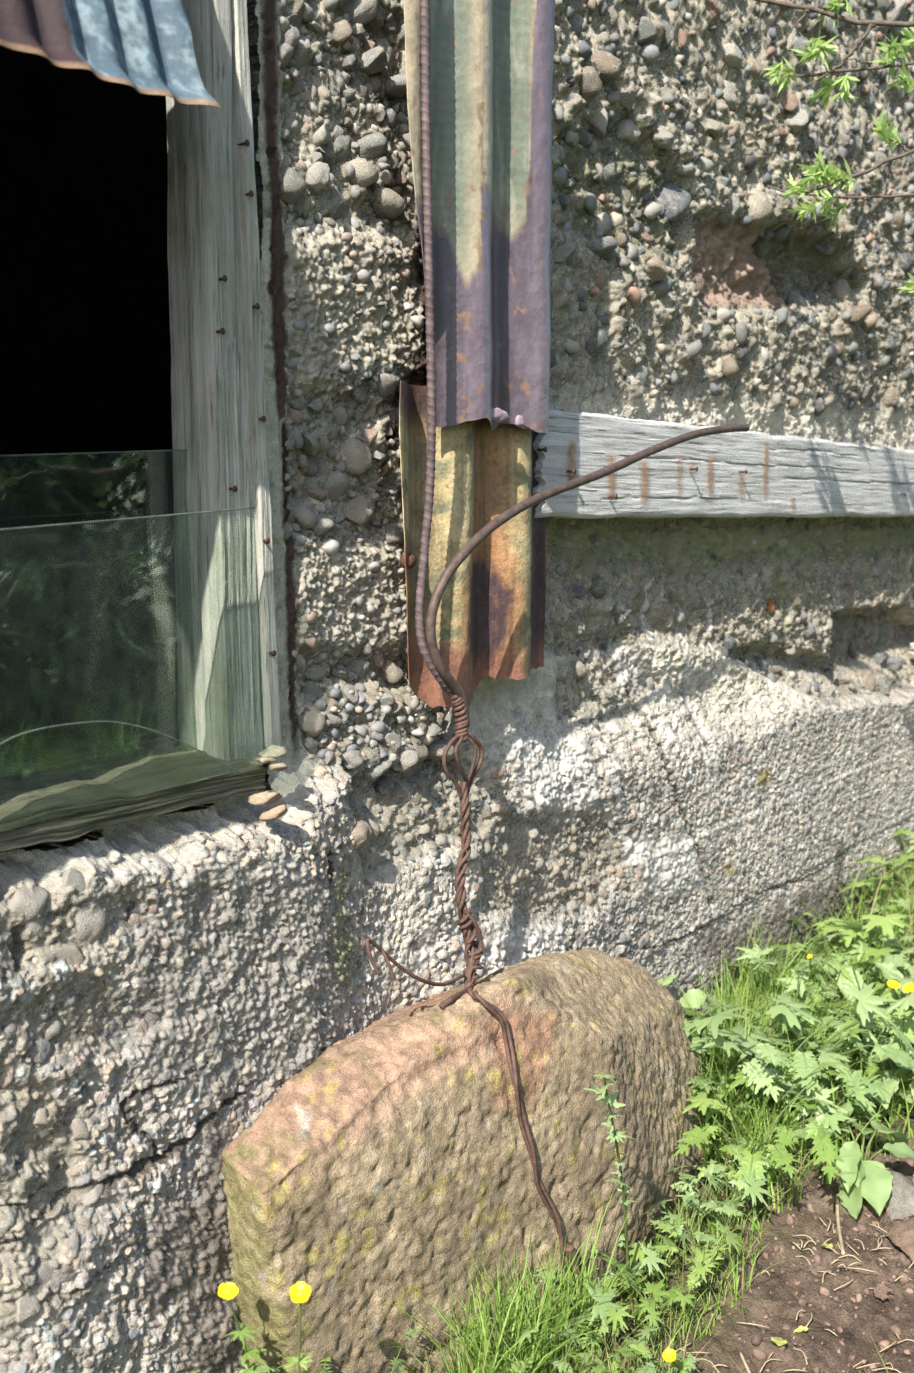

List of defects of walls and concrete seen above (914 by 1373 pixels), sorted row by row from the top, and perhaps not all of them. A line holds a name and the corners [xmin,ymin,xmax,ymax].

corrosion [262,0,299,740]
spalling [544,516,914,729]
crack [574,806,585,842]
crack [596,690,850,950]
crack [0,1061,251,1243]